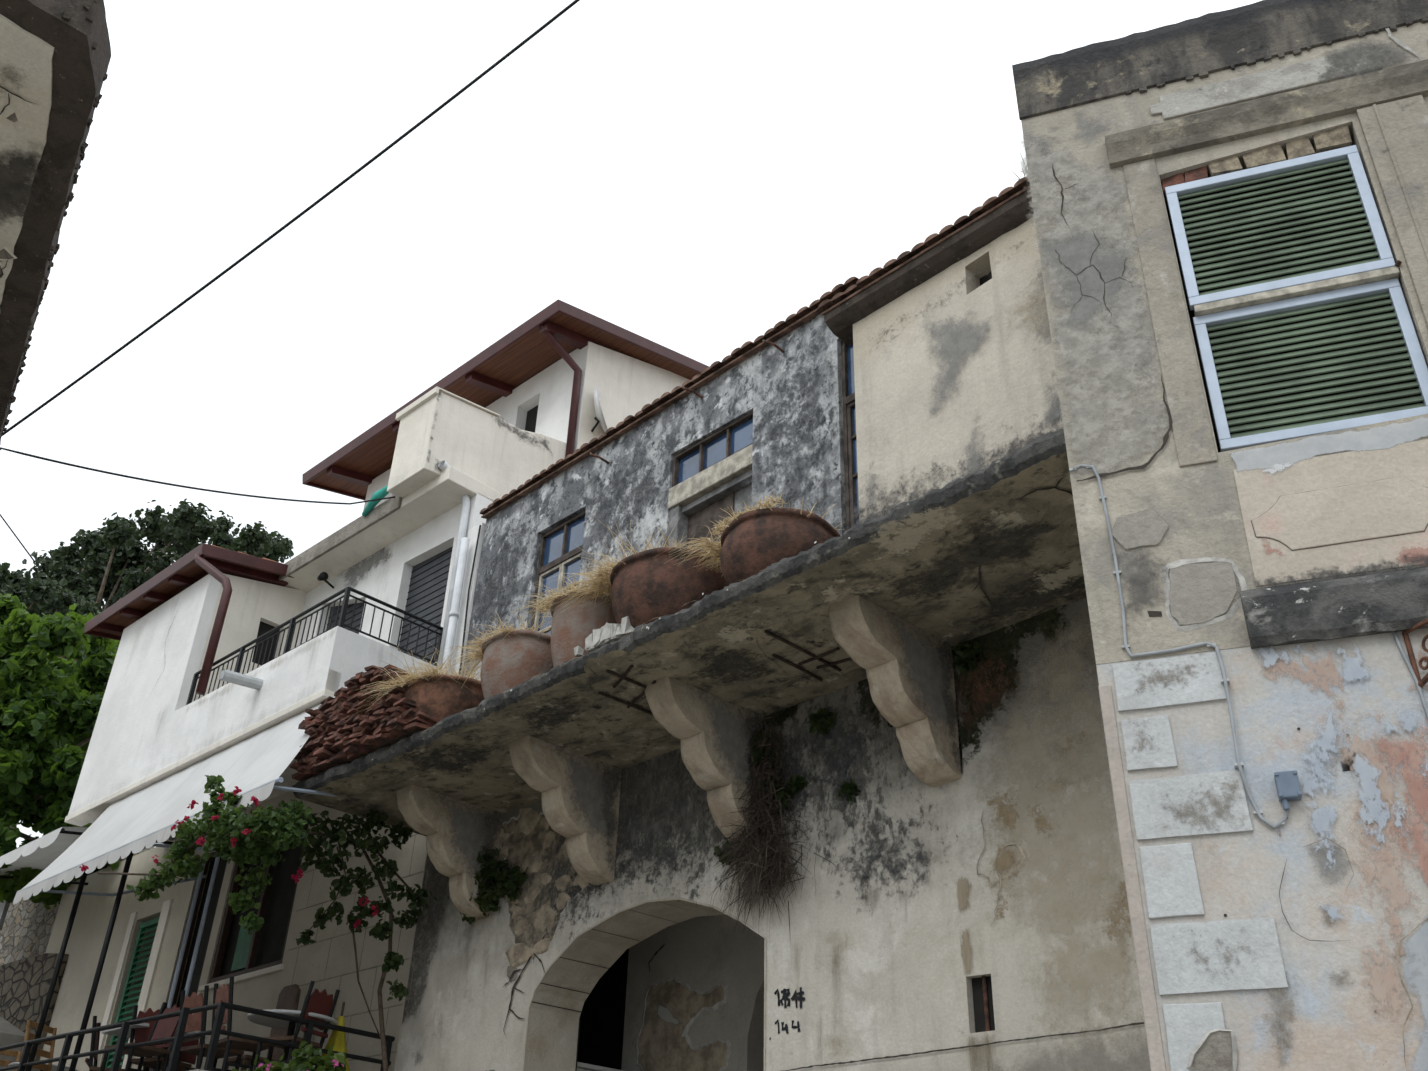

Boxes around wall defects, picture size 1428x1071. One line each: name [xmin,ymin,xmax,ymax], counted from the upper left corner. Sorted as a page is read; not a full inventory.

crack [0,86,35,115]
crack [1052,164,1133,316]
damp [746,333,842,516]
damp [474,443,672,646]
spalling [583,650,676,732]
spalling [715,615,862,685]
damp [872,519,1086,633]
flaking render [496,808,589,984]
damp [527,749,734,940]
damp [746,684,938,899]
peeling [1258,644,1428,955]
spalling [1187,1029,1237,1071]